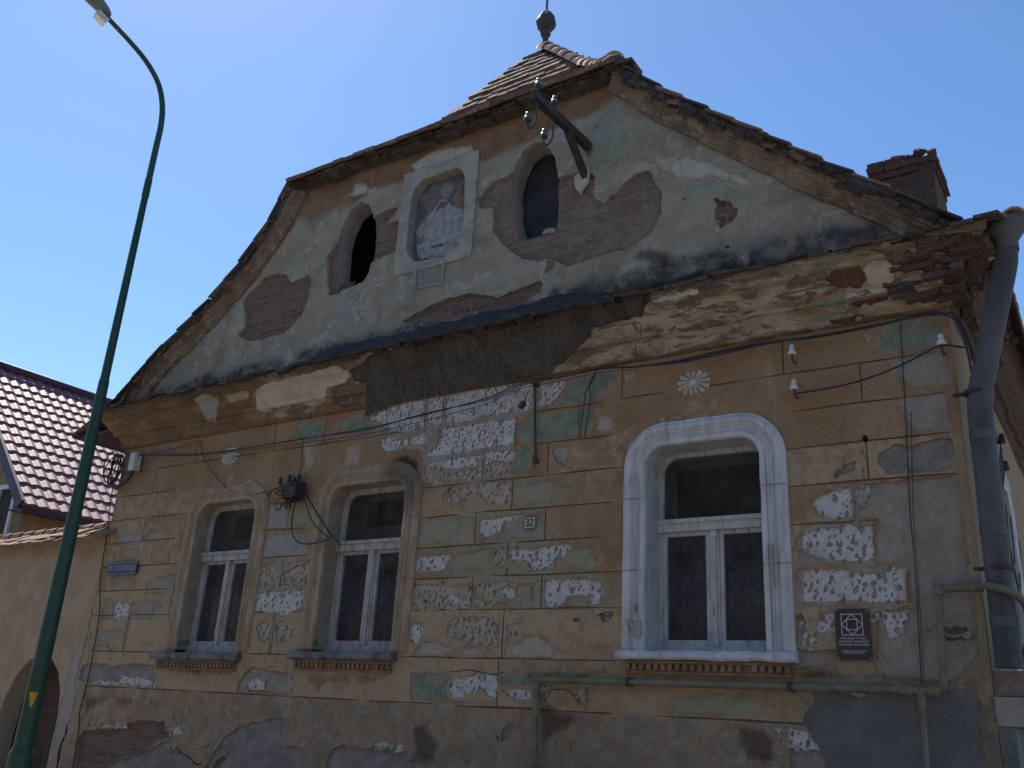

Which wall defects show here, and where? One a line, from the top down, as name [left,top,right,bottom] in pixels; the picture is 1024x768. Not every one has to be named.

spalling [374,207,399,261]
spalling [477,115,662,267]
spalling [713,196,738,229]
spalling [326,241,341,296]
spalling [194,273,699,497]
spalling [792,260,980,684]
peeling [545,596,616,623]
spalling [74,720,171,768]